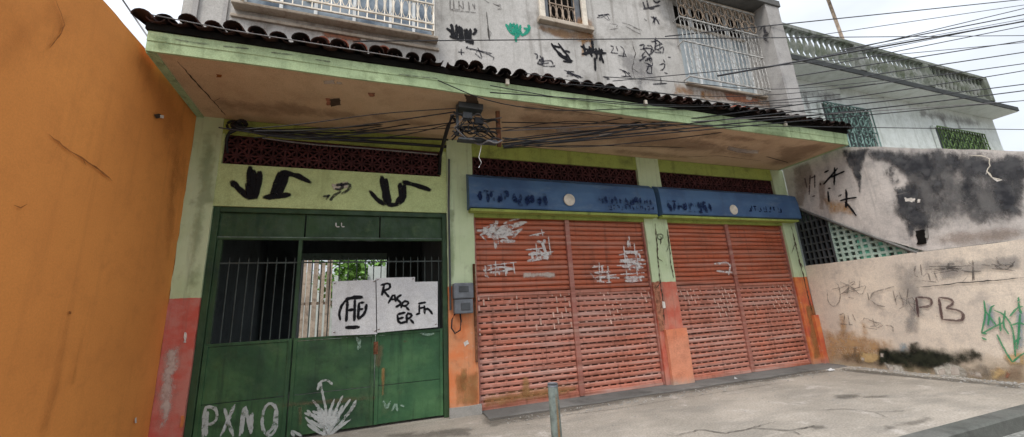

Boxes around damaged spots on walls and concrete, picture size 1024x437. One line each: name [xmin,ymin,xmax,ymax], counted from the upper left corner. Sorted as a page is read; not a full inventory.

crack [177,61,225,114]
crack [50,135,110,178]
damp [843,149,1024,236]
damp [827,323,981,369]
peeling [161,332,187,425]